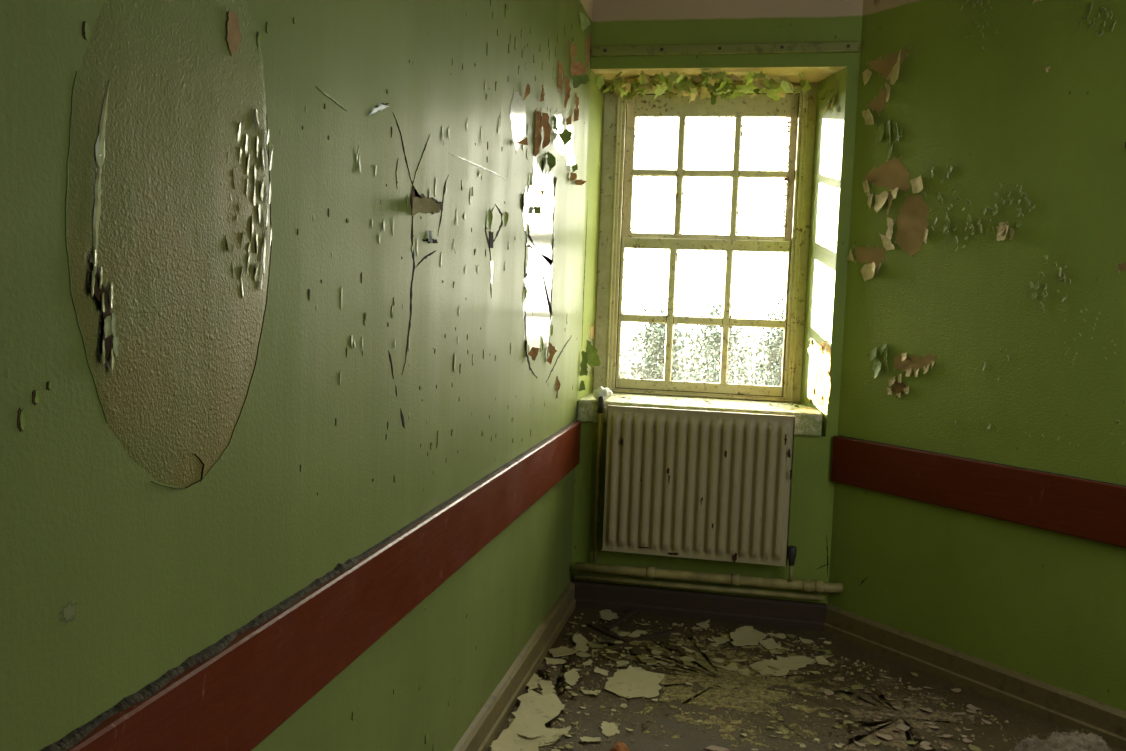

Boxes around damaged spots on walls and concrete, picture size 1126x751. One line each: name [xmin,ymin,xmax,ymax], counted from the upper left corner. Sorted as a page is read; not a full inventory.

peeling [847,46,930,281]
peeling [486,0,812,406]
peeling [996,222,1014,241]
flaking render [769,340,831,409]
peeling [866,343,939,399]